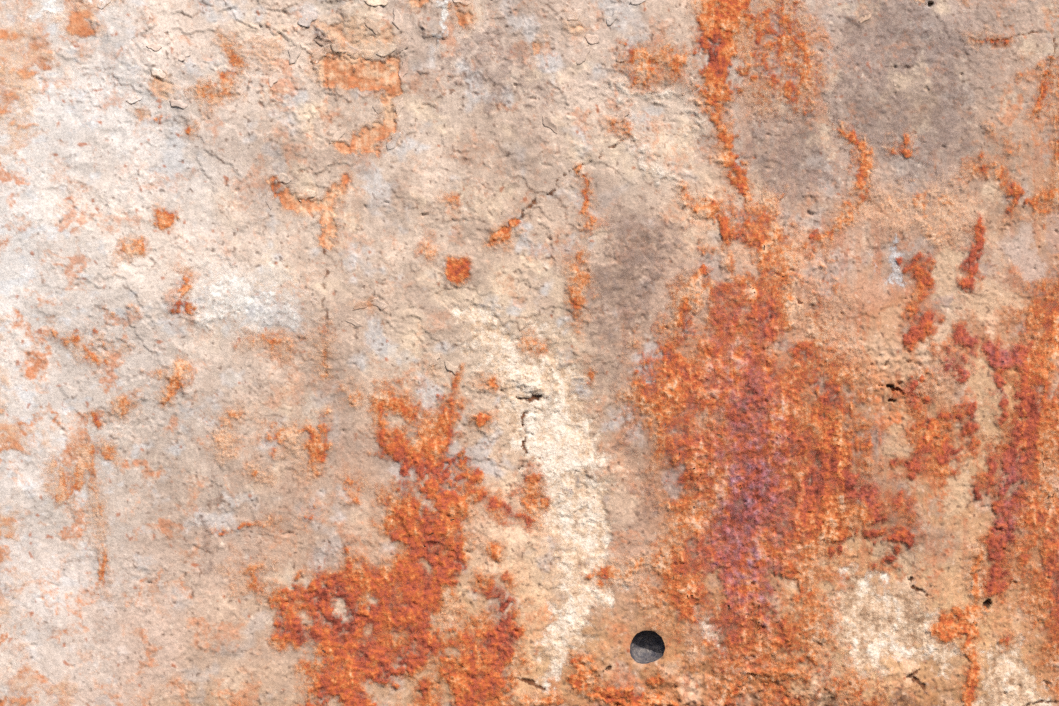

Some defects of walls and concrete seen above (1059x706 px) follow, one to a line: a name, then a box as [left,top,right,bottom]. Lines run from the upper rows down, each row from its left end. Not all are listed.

corrosion [66,0,100,37]
corrosion [0,28,54,149]
corrosion [574,164,597,230]
corrosion [486,217,521,248]
corrosion [418,242,470,285]
corrosion [563,250,596,333]
corrosion [517,329,548,354]
corrosion [586,0,1059,706]
corrosion [214,410,244,464]
corrosion [215,363,564,706]
corrosion [568,652,679,706]